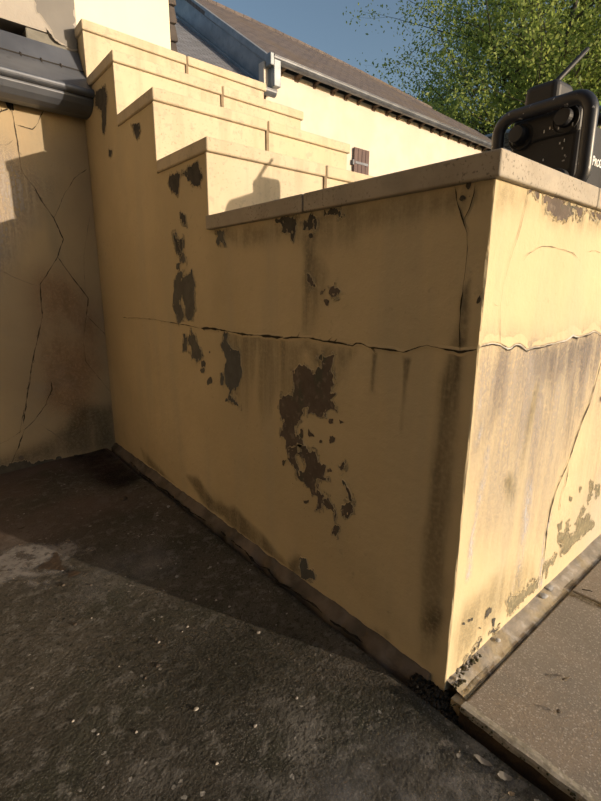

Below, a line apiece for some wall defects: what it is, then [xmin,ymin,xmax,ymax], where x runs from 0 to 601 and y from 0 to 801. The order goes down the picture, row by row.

crack [0,103,105,464]
peeling [168,160,203,198]
peeling [171,210,243,411]
crack [123,187,477,357]
crack [496,192,600,344]
peeling [527,189,601,226]
peeling [277,350,357,540]
damp [481,339,601,472]
crack [539,359,601,591]
peeling [462,479,600,664]